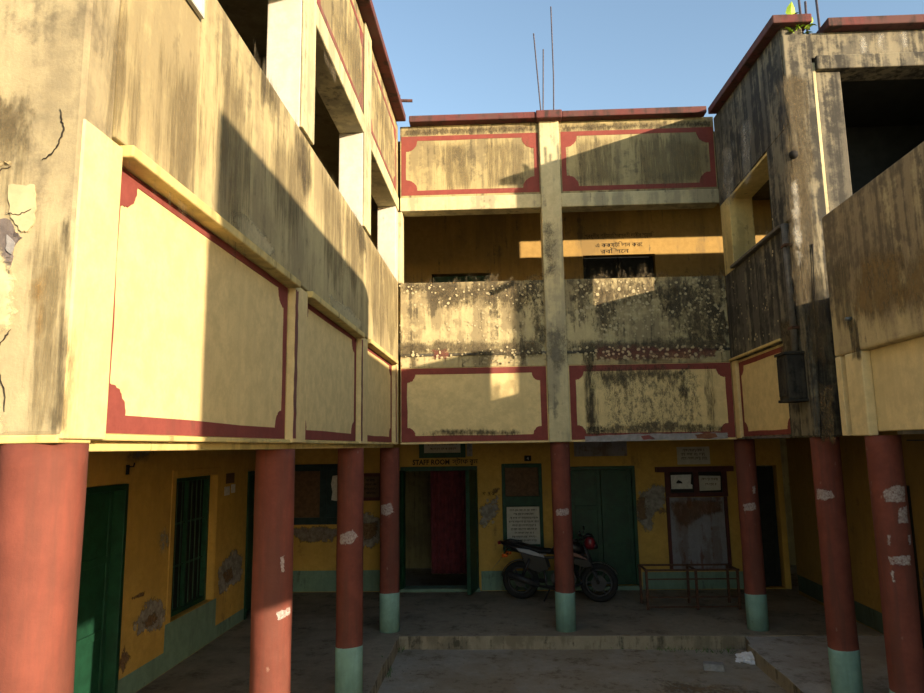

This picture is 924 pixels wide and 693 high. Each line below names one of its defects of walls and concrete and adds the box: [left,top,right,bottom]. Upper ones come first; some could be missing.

crack [0,161,12,171]
damp [0,97,26,159]
crack [42,108,65,160]
damp [170,76,201,187]
damp [217,57,250,226]
damp [262,64,276,108]
damp [276,126,311,227]
peeling [0,184,37,272]
damp [783,76,924,366]
damp [322,176,729,435]
peeling [218,549,243,594]
peeling [133,598,166,636]